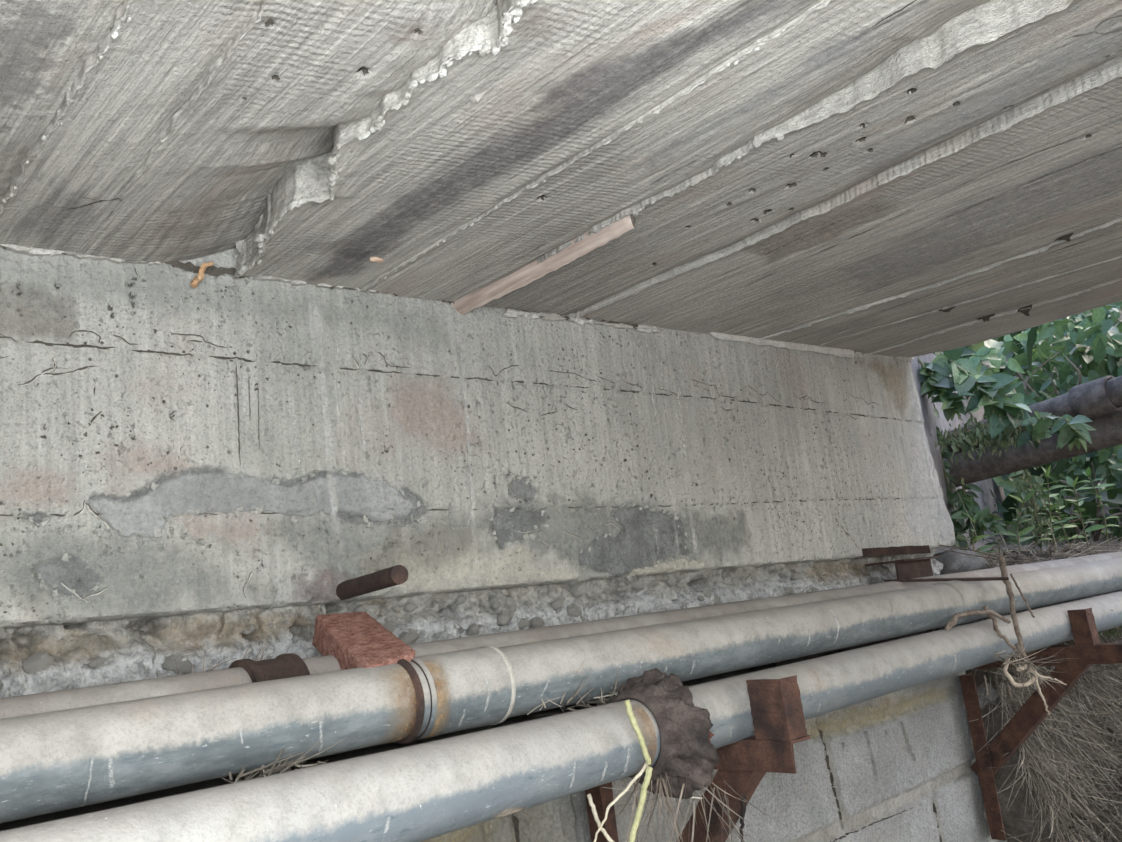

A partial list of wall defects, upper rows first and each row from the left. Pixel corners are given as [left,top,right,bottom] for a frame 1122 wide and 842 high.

peeling [479,0,537,56]
peeling [402,80,418,106]
peeling [369,115,386,133]
water stain [320,1,784,276]
peeling [327,155,339,187]
crack [18,330,138,424]
crack [173,333,260,465]
crack [352,352,412,374]
crack [507,403,577,416]
crack [551,370,821,411]
peeling [89,467,426,542]
peeling [27,551,101,596]